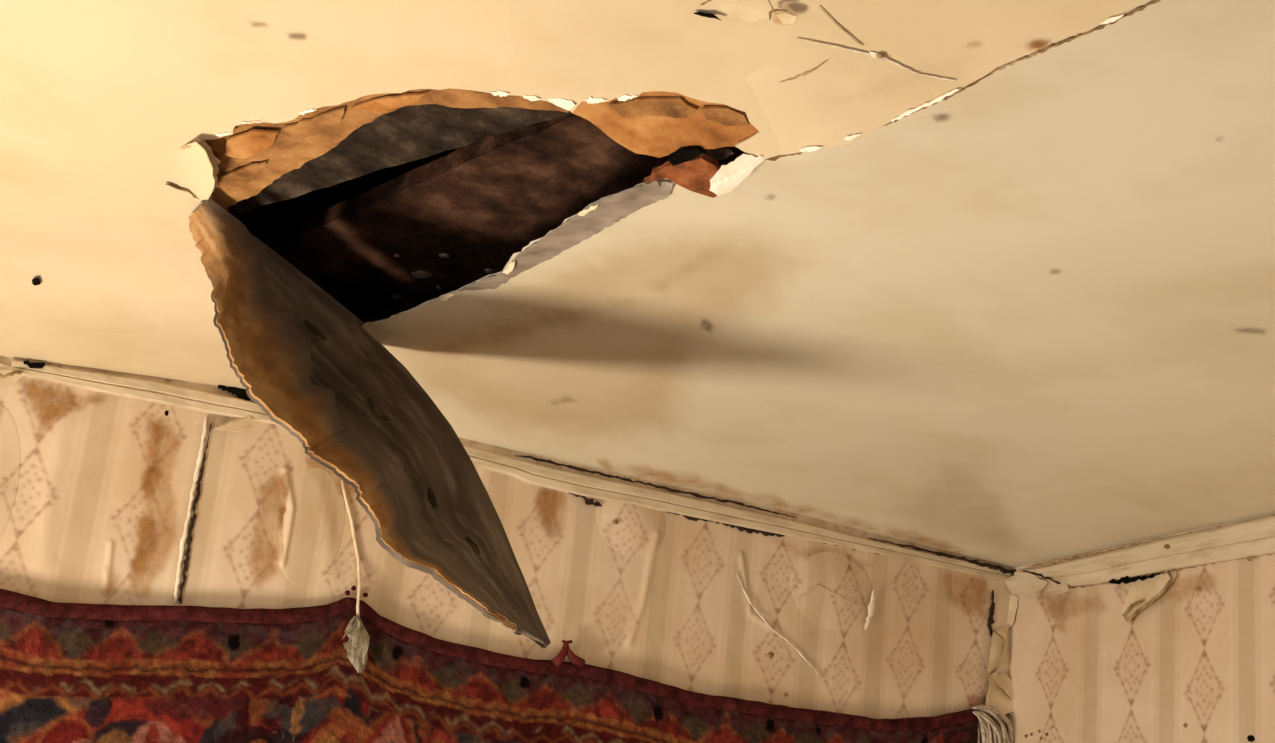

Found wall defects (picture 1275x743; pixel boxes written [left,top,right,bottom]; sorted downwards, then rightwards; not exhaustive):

peeling [693,0,797,24]
crack [766,0,1161,161]
spalling [204,88,759,307]
crack [24,360,45,368]
leakage [27,383,73,426]
crack [218,385,251,400]
crack [173,417,212,604]
leakage [537,492,558,527]
leakage [133,519,172,574]